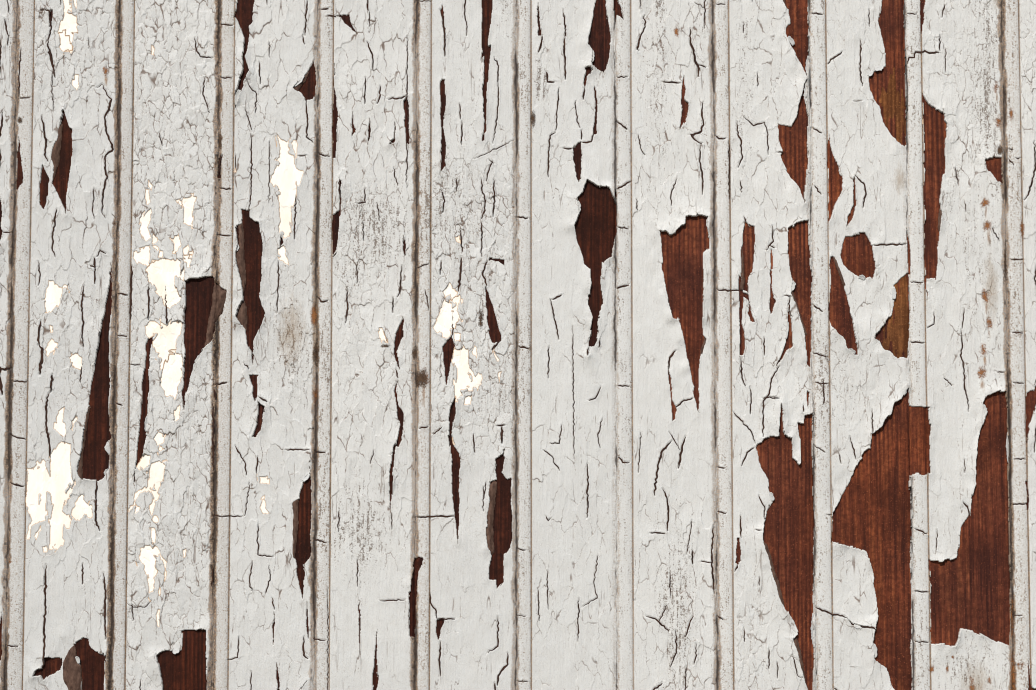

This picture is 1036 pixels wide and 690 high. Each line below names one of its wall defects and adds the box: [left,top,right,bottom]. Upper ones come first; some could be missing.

crack [0,321,54,463]
crack [0,0,61,164]
crack [392,58,527,313]
crack [538,35,594,177]
peeling [573,142,617,351]
crack [488,295,765,690]
peeling [660,215,709,410]
crack [670,103,784,221]
peeling [756,391,815,690]
peeling [827,138,875,355]
peeling [831,390,931,690]
peeling [928,391,1010,646]